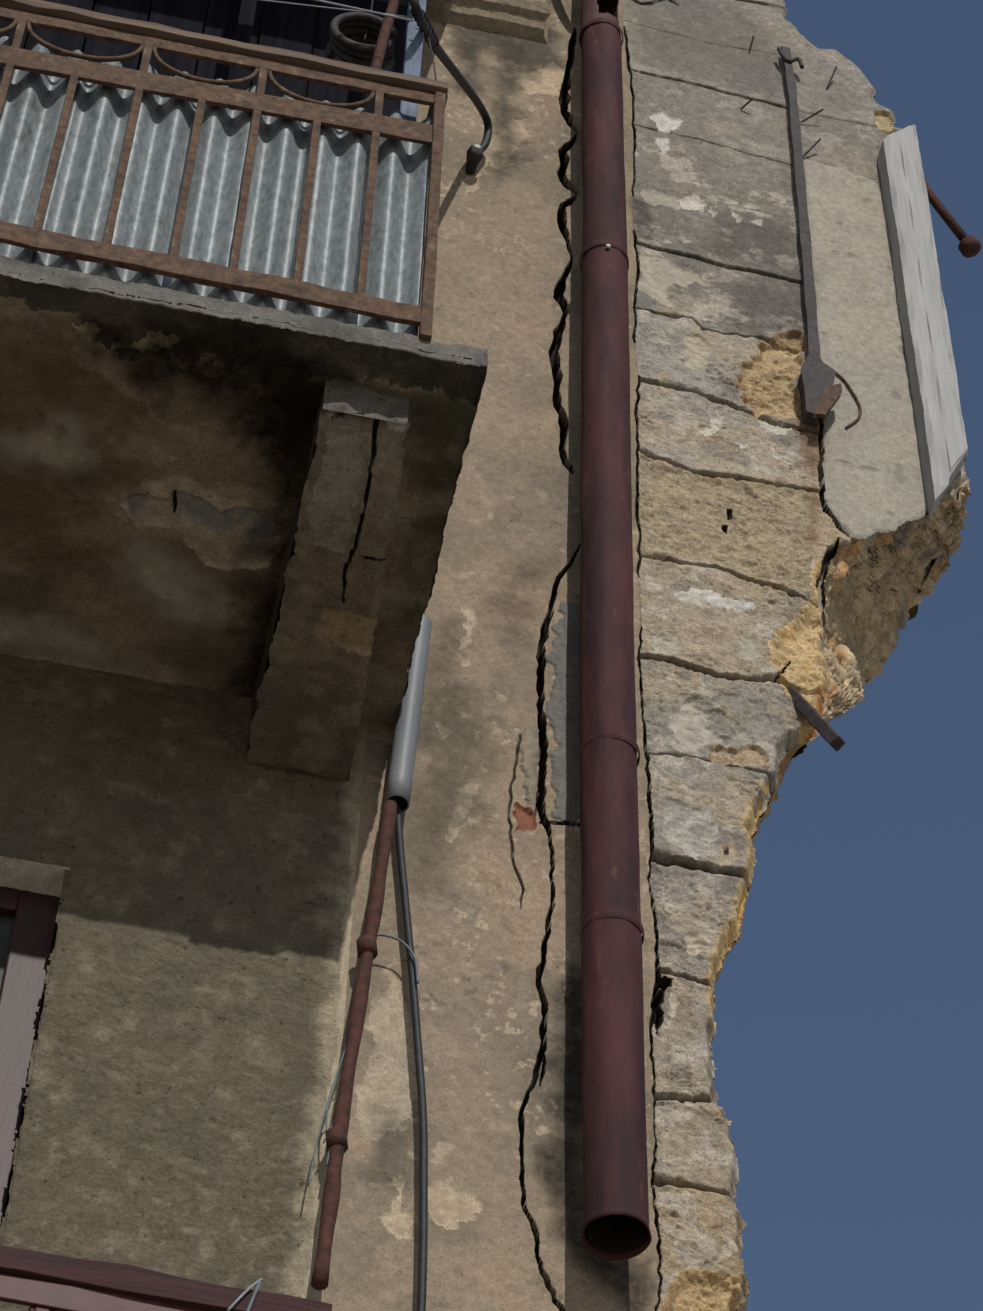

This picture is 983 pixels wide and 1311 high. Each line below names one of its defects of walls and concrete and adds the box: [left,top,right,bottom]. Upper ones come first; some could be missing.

crack [548,27,579,474]
flaking render [118,473,282,571]
water stain [232,374,324,698]
crack [331,412,388,603]
crack [774,661,791,683]
flaking render [635,454,972,867]
crack [816,418,849,627]
crack [507,544,581,1311]